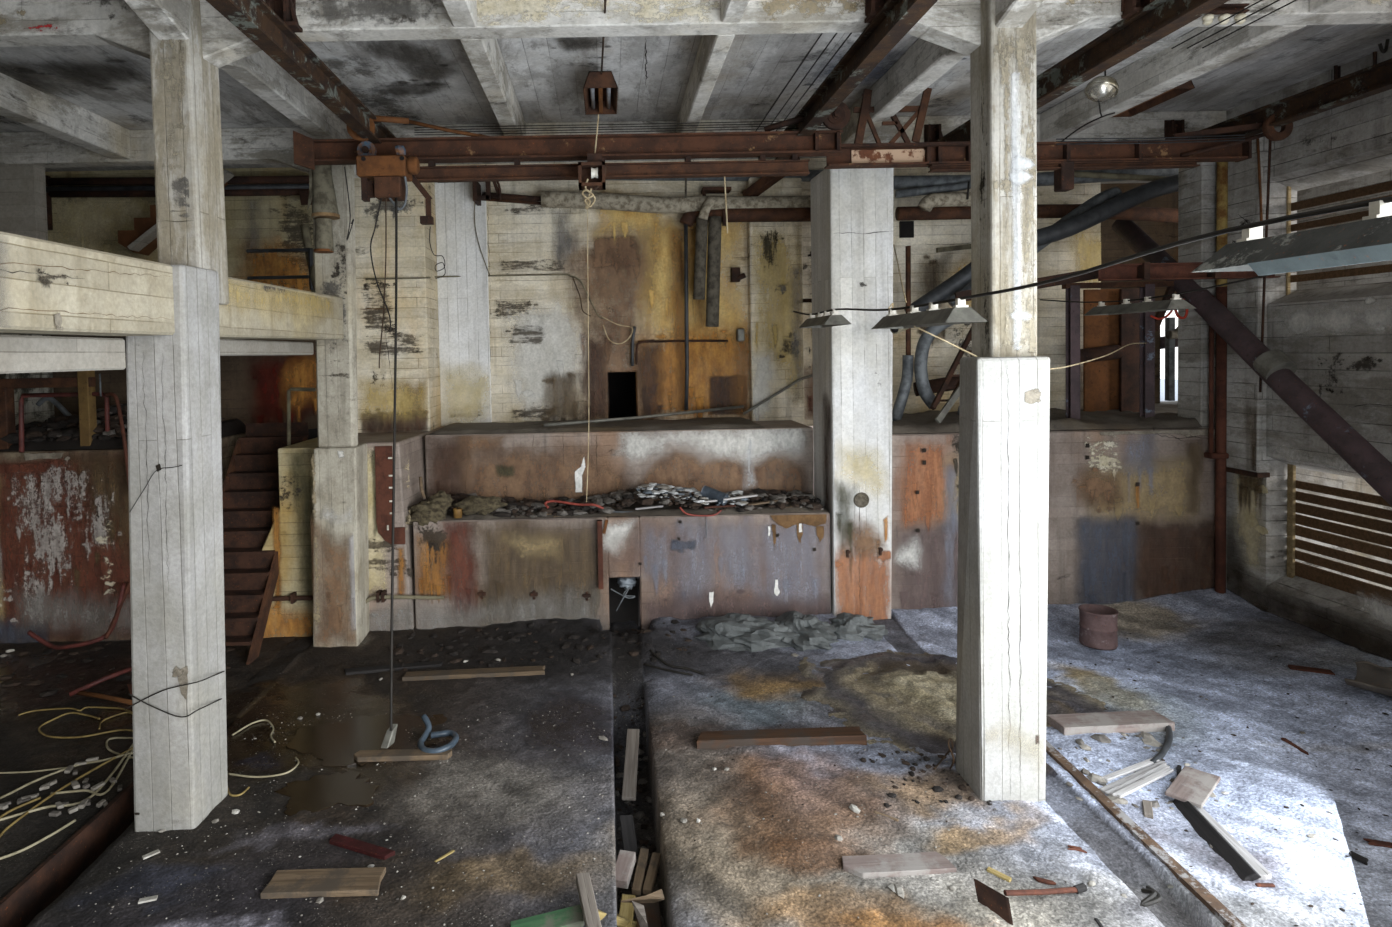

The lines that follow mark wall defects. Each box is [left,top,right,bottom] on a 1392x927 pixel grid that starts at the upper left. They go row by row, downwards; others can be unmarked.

leakage [299,0,451,120]
peeling [3,453,122,624]
leakage [262,196,423,378]
leakage [362,371,428,433]
leakage [280,452,828,644]
leakage [463,216,812,503]
rust [593,209,749,420]
rust [808,377,831,513]
rust [830,444,959,620]